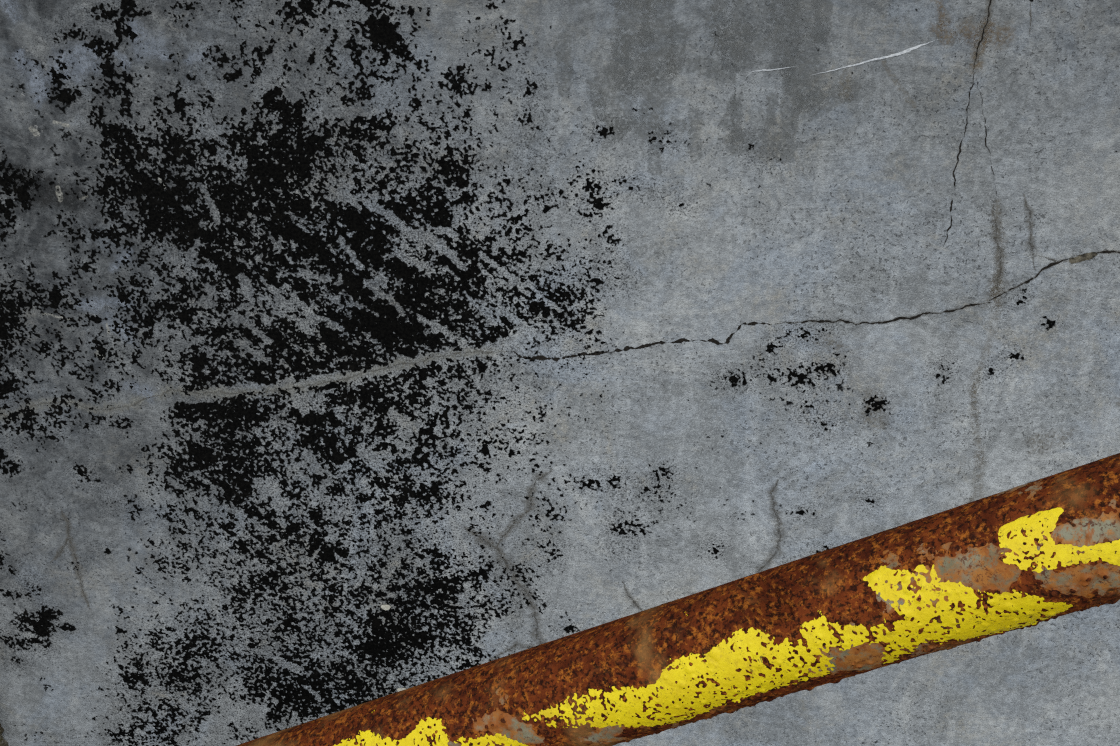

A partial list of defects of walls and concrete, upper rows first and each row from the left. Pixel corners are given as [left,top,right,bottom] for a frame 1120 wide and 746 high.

water stain [54,46,97,81]
water stain [4,165,84,210]
crack [468,0,1120,361]
crack [472,469,553,654]